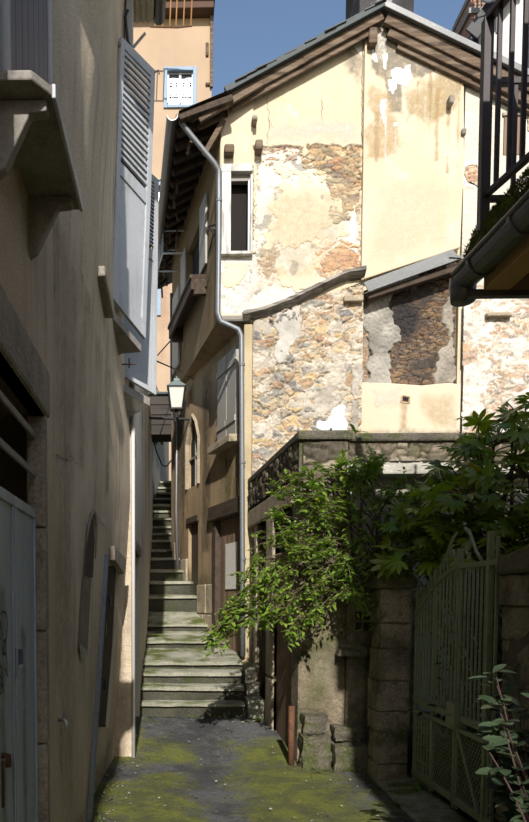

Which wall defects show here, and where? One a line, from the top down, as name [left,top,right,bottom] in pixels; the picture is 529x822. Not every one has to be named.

peeling [354,41,413,127]
damp [366,20,461,160]
spalling [221,140,369,475]
spalling [391,261,529,433]